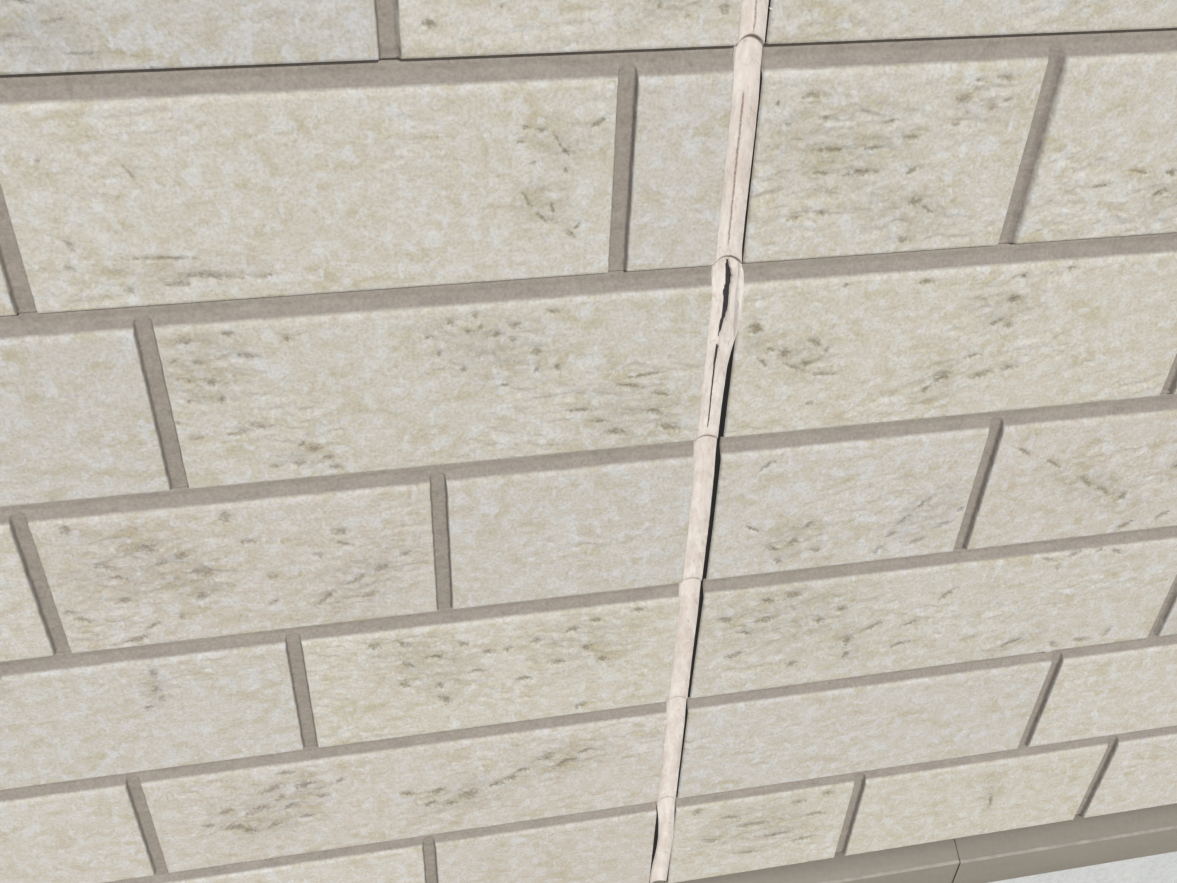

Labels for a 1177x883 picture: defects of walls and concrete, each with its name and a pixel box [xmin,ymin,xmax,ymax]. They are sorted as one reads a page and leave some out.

crack [649,0,771,883]